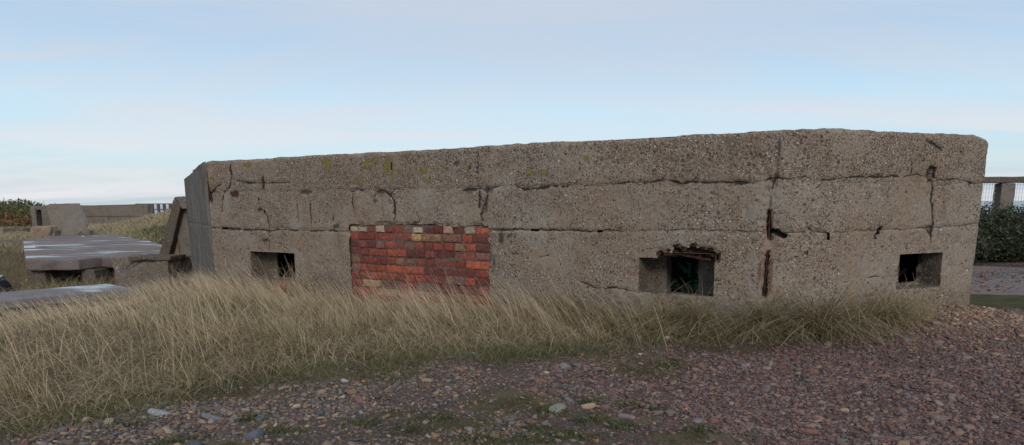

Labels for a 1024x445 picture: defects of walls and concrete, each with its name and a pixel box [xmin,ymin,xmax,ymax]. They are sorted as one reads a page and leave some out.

crack [211,164,396,249]
crack [463,155,982,257]